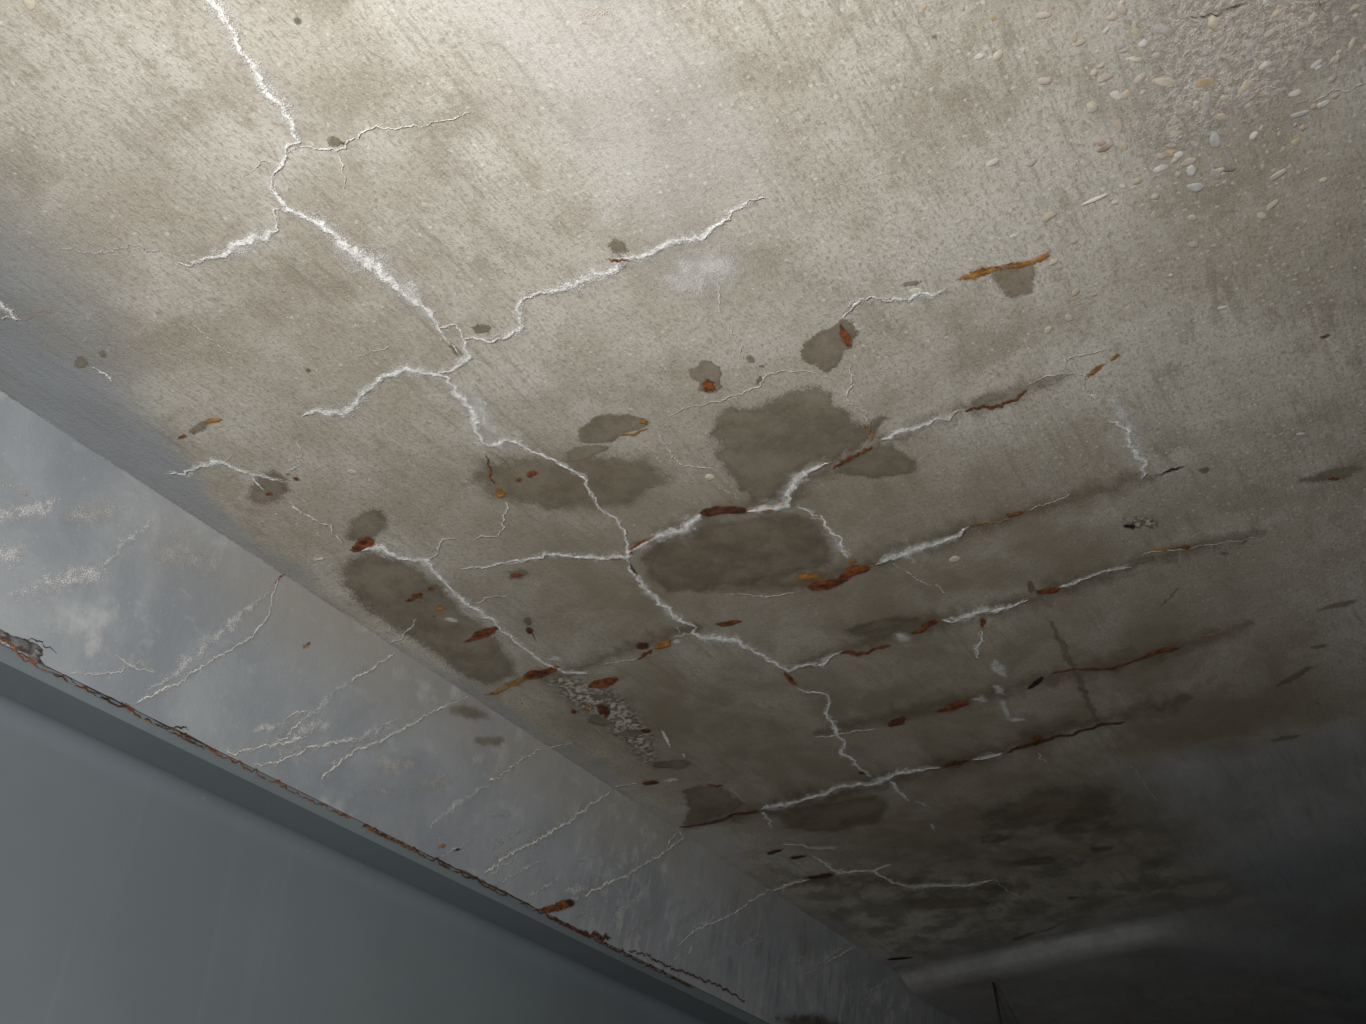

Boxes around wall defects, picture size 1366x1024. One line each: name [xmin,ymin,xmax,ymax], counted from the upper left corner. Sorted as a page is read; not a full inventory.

crack [0,302,52,321]
rust [957,248,1055,300]
rust [476,457,538,539]
damp [460,413,678,515]
crack [57,0,1266,899]
damp [635,319,919,594]
damp [337,508,519,689]
rust [485,619,743,719]
damp [973,617,1027,722]
damp [443,701,505,746]
spalling [0,629,745,1002]
crack [676,844,1029,947]